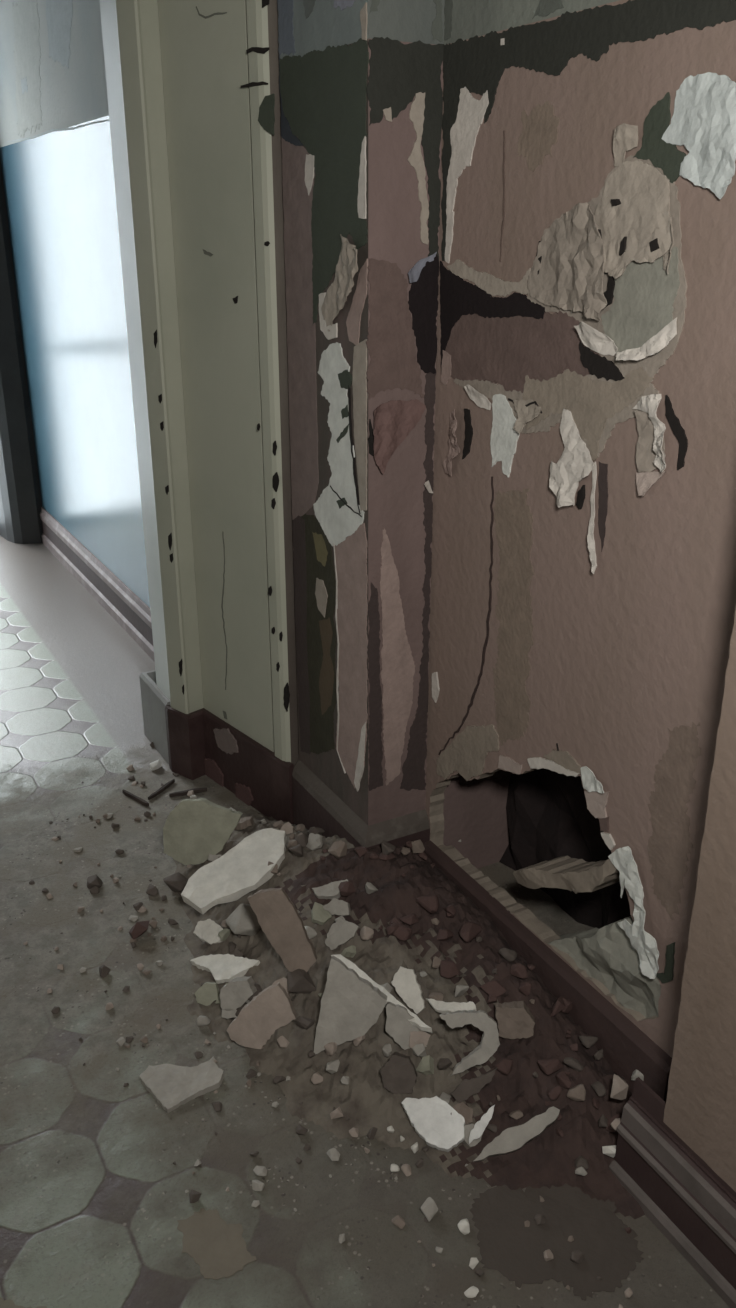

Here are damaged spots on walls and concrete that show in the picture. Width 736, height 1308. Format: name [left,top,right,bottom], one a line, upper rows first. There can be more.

crack [196,6,227,19]
flaking render [305,154,315,196]
flaking render [357,136,367,219]
peeling [366,72,736,462]
flaking render [292,342,365,754]
crack [439,477,494,755]
peeling [276,662,290,711]
flaking render [432,672,440,703]
spalling [436,724,616,871]
flaking render [539,882,661,1018]